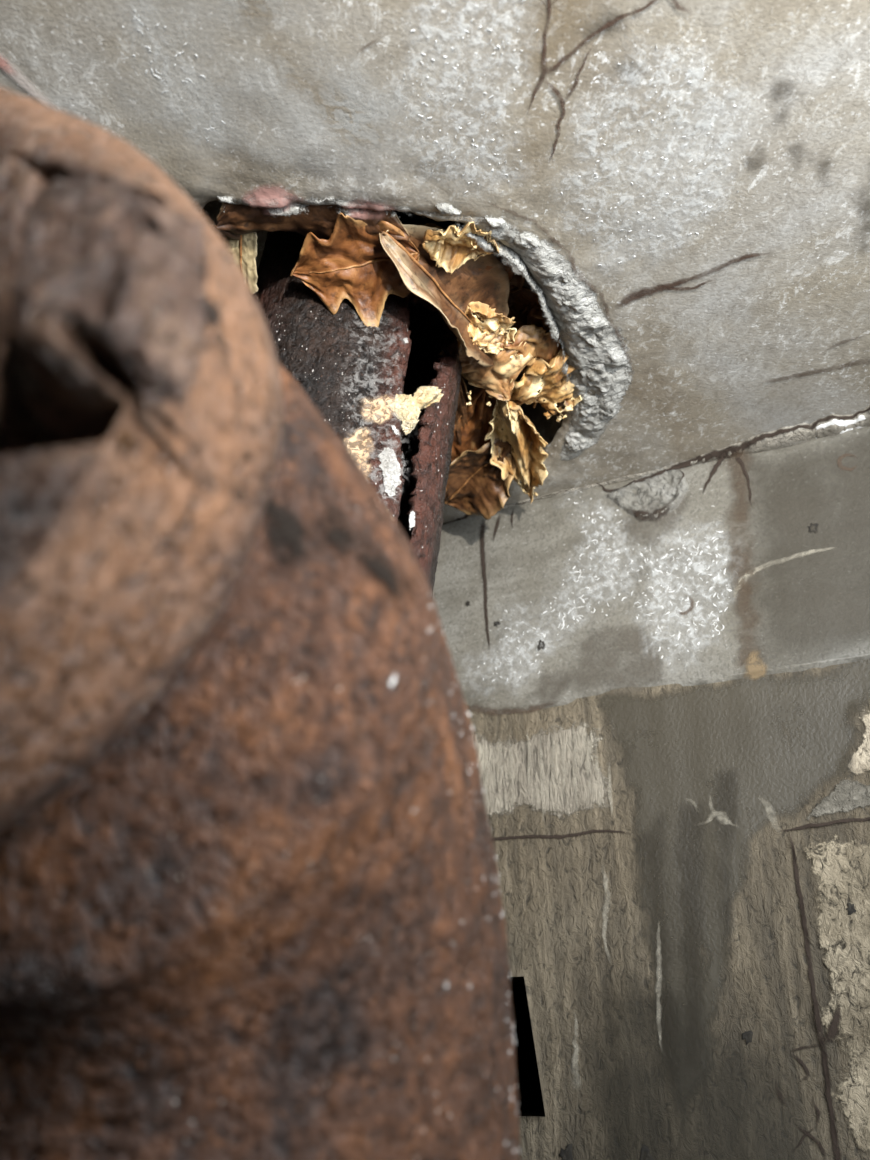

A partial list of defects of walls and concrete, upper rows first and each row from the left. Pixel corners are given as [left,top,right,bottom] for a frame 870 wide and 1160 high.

crack [532,0,683,157]
spalling [216,187,634,460]
crack [621,253,761,304]
crack [772,340,858,381]
crack [504,407,870,506]
peeling [847,711,870,774]
water stain [477,497,870,1160]
peeling [803,835,870,1152]